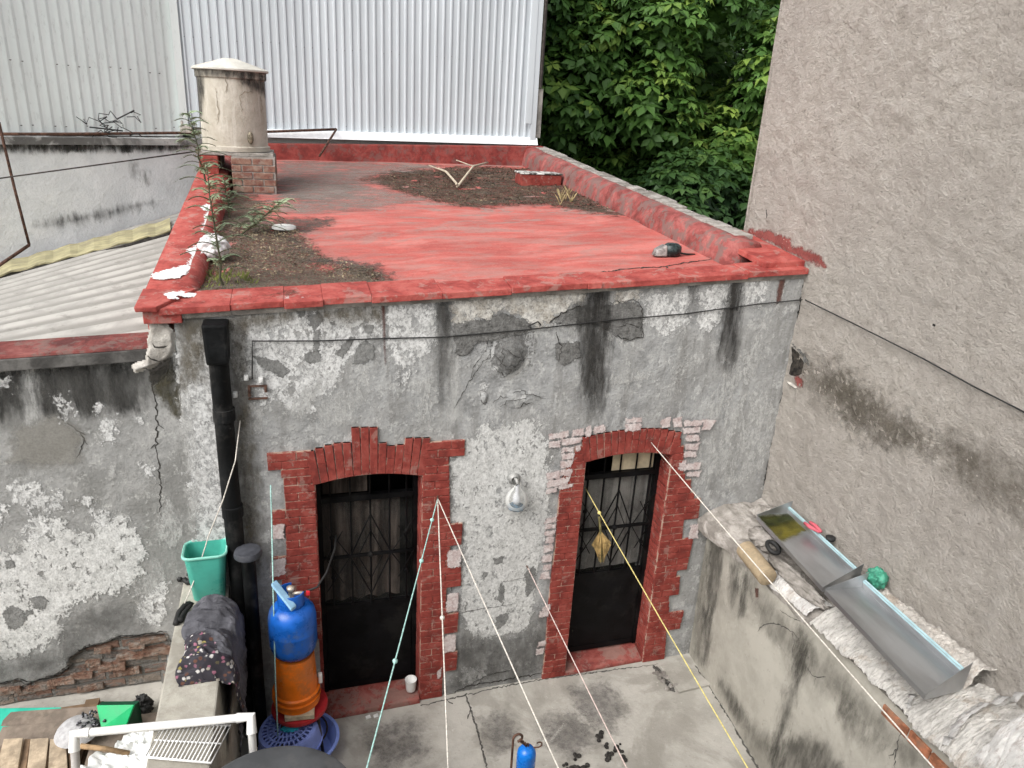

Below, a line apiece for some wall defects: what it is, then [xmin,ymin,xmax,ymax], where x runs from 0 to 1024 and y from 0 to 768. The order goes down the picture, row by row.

damp [0,318,205,446]
peeling [224,281,784,432]
damp [576,291,611,412]
damp [718,282,742,362]
crack [151,385,164,519]
peeling [660,417,716,477]
peeling [688,524,699,539]
peeling [0,479,172,706]
damp [704,549,721,655]